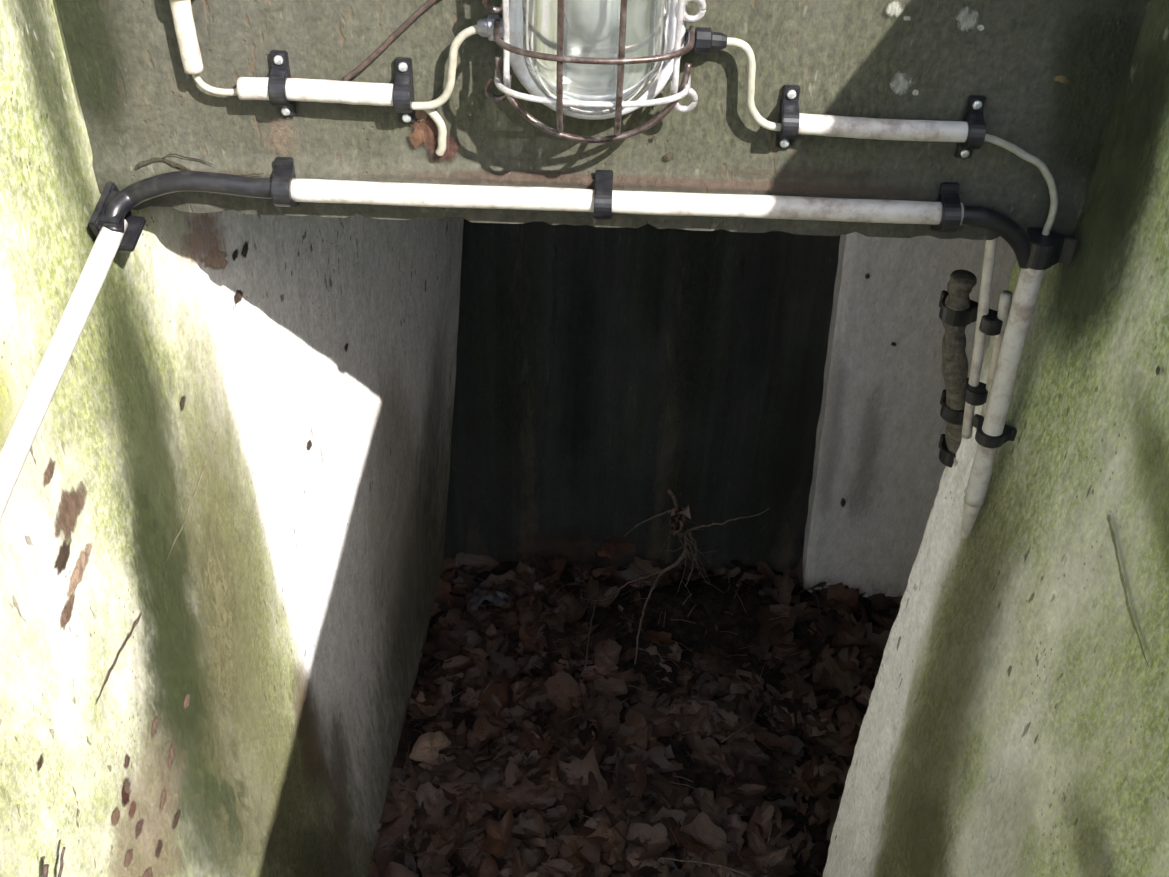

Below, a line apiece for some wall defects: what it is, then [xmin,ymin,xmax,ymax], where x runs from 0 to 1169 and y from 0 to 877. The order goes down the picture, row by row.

corrosion [409,110,460,161]
corrosion [613,176,896,194]
crack [1107,514,1149,667]